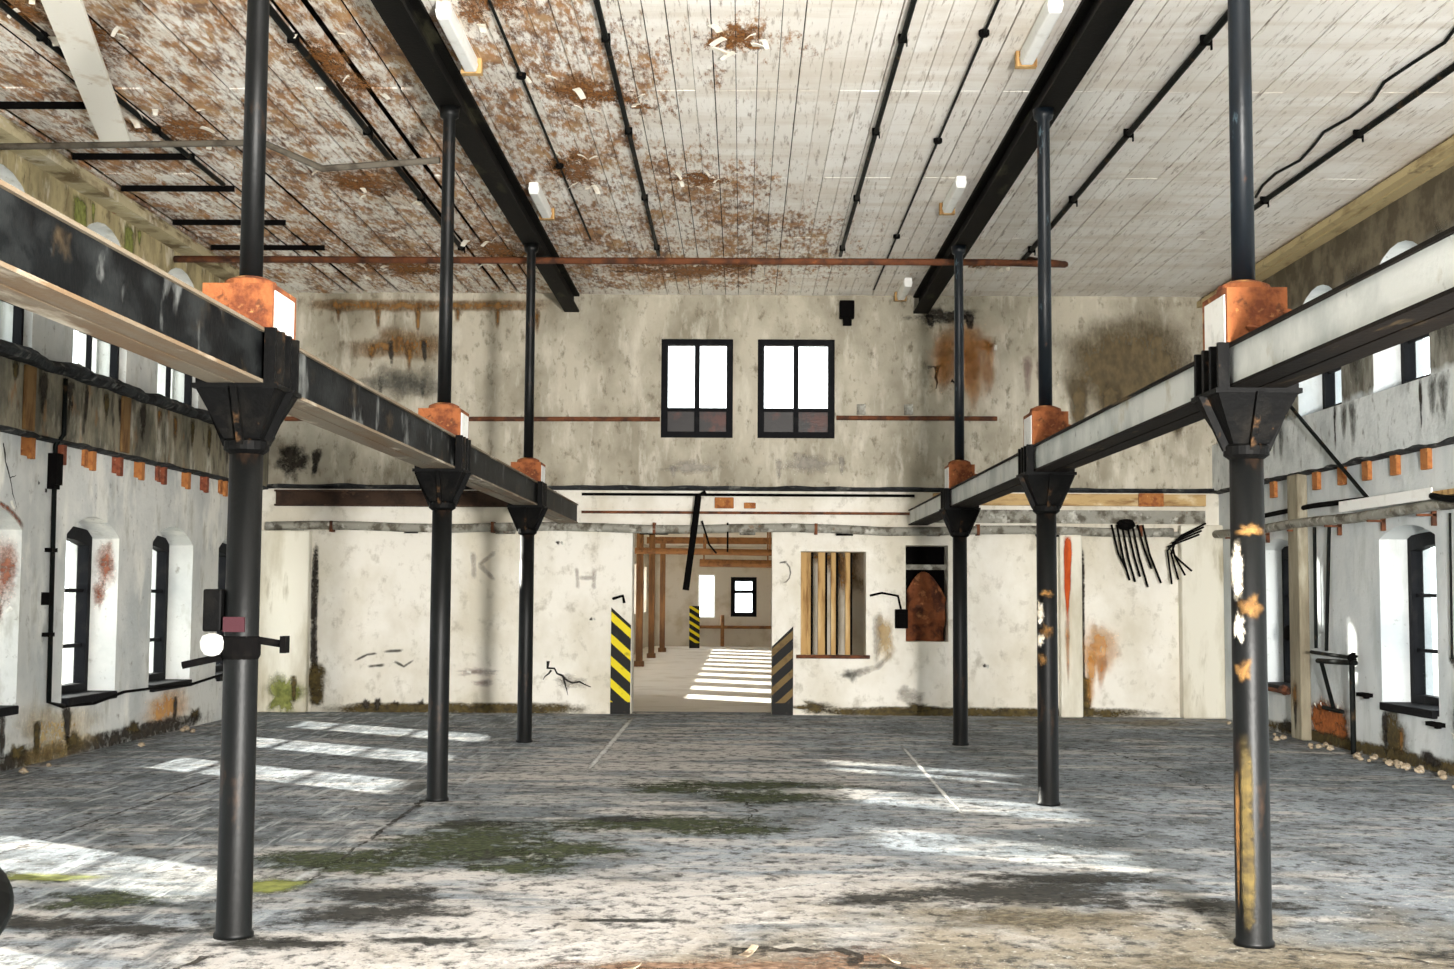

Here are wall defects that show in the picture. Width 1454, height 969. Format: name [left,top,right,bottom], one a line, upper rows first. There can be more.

peeling [86,11,135,72]
peeling [705,19,769,61]
peeling [525,74,653,112]
peeling [129,107,219,150]
peeling [668,170,744,191]
water stain [1069,319,1188,424]
rust [1064,537,1072,651]
rust [1087,634,1108,691]
water stain [0,707,201,772]
water stain [1269,719,1292,736]
water stain [1311,711,1454,776]
rust [1235,750,1255,925]